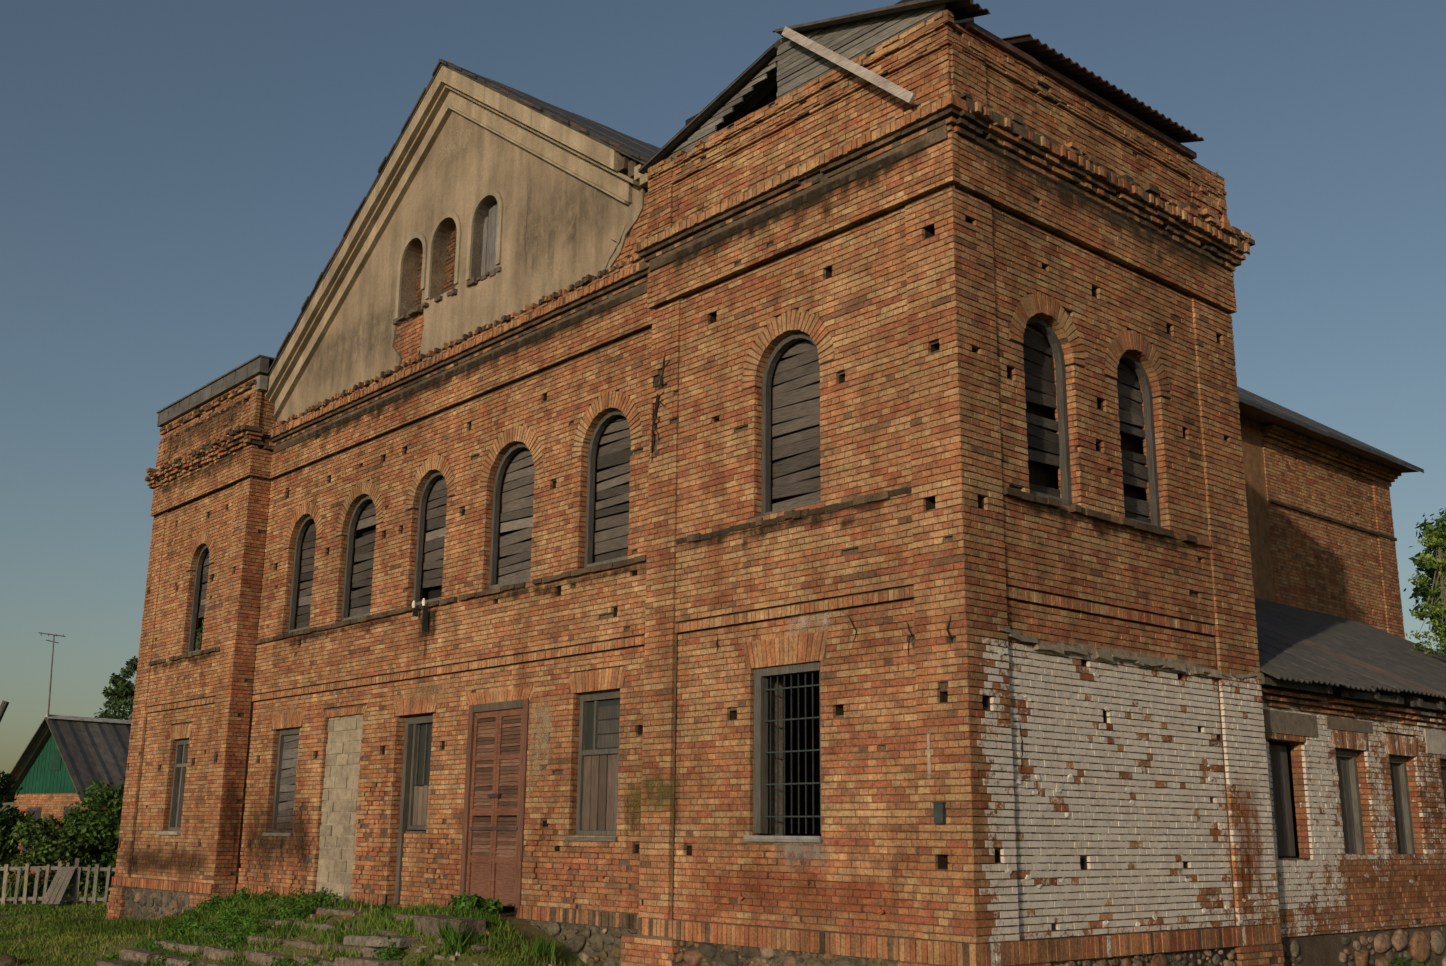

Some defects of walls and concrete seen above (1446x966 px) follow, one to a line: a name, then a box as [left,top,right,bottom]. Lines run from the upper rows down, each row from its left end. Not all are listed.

crack [650,352,671,451]
peeling [992,650,1032,727]
peeling [1072,655,1099,681]
peeling [1102,707,1114,744]
peeling [1015,752,1086,817]
peeling [1185,759,1259,924]
peeling [1005,868,1064,889]
peeling [1088,920,1109,928]
peeling [1135,915,1164,927]
peeling [1346,860,1446,931]